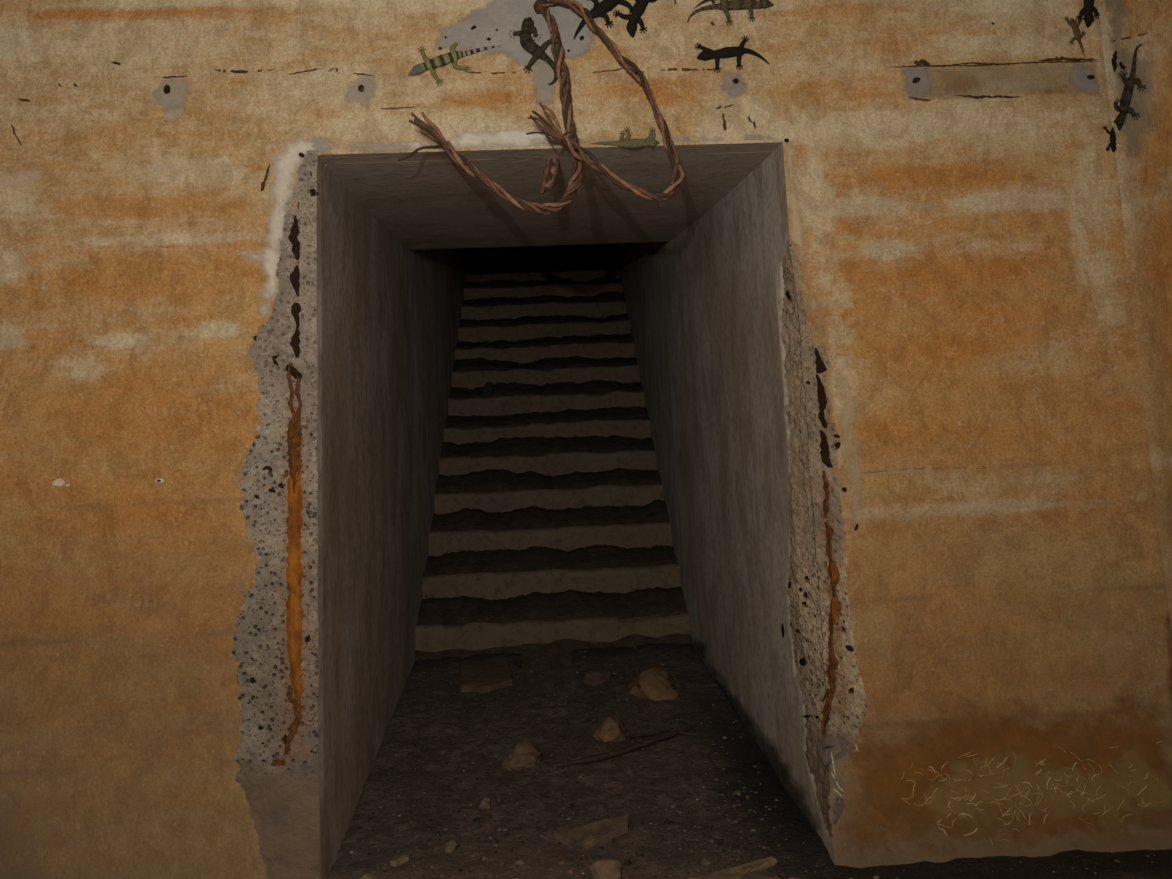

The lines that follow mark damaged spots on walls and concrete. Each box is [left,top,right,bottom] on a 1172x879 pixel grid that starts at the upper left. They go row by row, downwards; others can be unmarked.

water stain [241,138,331,313]
water stain [357,130,563,151]
water stain [657,104,734,143]
spalling [231,150,320,879]
spalling [781,238,868,839]